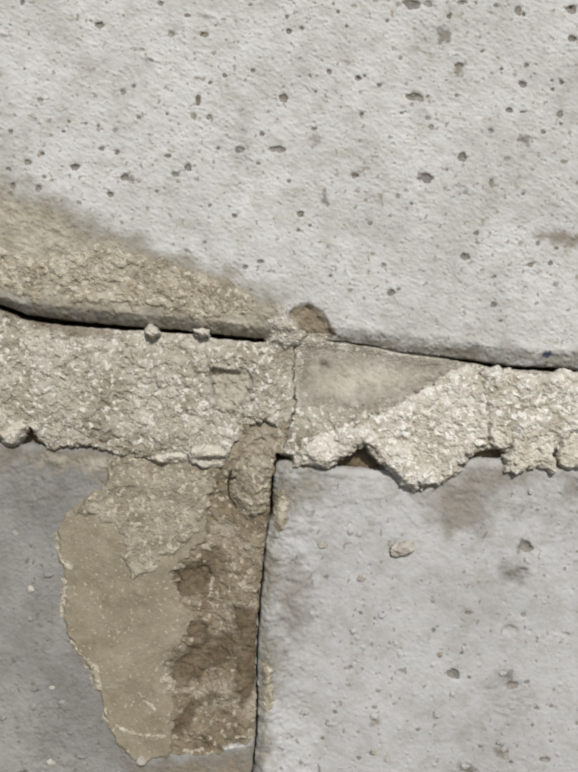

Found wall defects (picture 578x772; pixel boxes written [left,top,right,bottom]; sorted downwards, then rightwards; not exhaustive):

crack [0,305,264,342]
crack [335,341,574,372]
crack [227,470,237,509]
spalling [163,419,290,756]